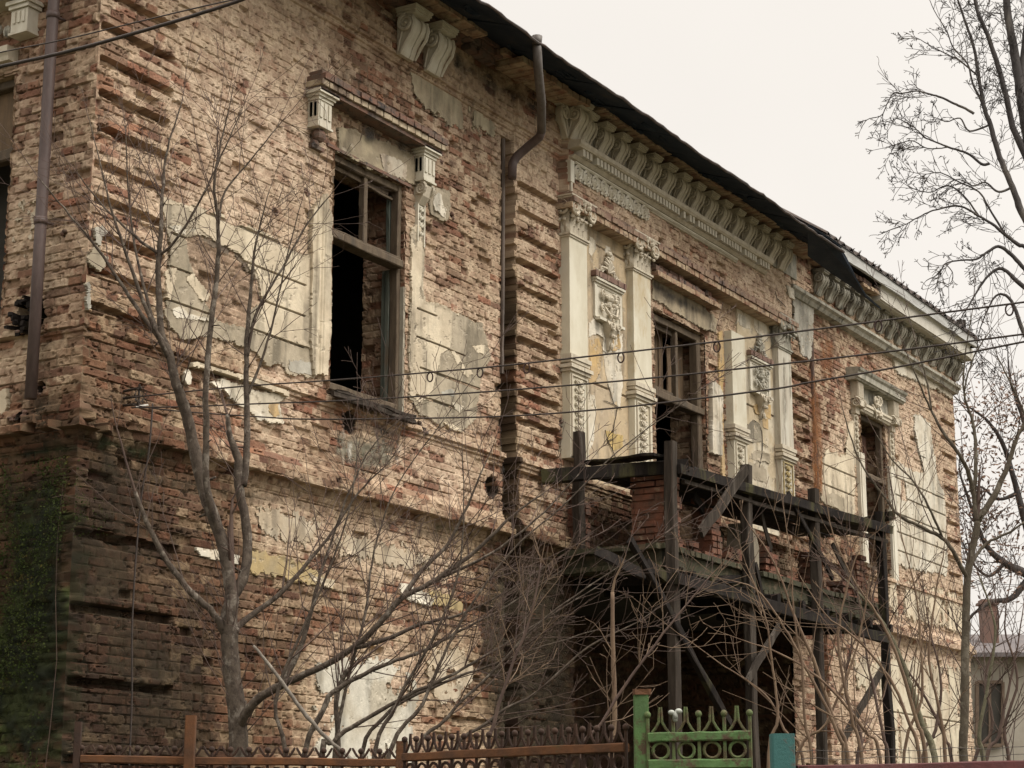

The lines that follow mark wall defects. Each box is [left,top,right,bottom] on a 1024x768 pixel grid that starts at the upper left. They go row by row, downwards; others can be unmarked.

peeling [157,188,333,379]
peeling [406,224,491,435]
peeling [194,547,219,561]
peeling [234,505,463,612]
peeling [819,420,856,514]
peeling [888,414,963,634]
peeling [313,646,473,768]